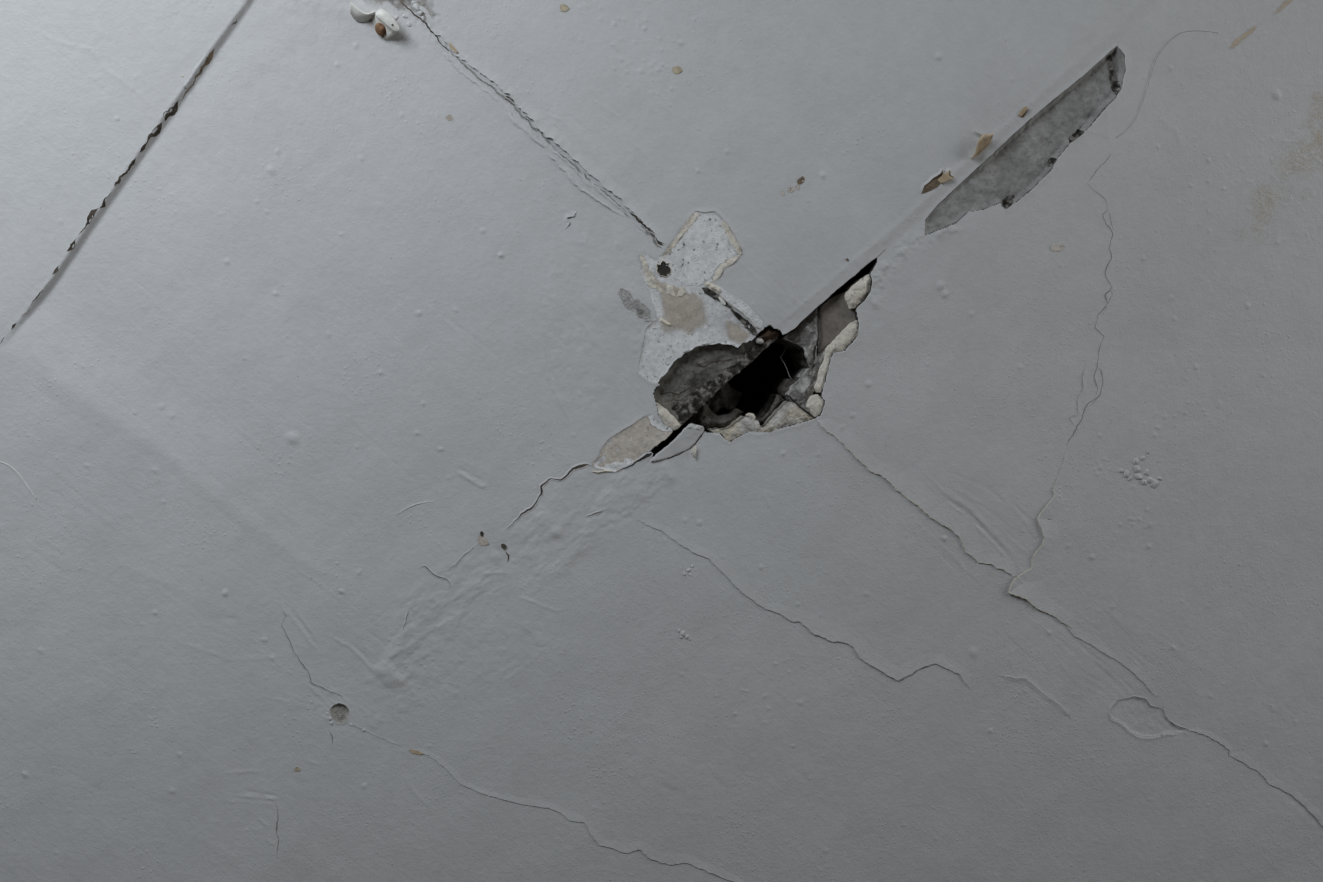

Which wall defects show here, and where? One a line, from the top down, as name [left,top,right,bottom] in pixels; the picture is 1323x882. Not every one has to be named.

crack [0,0,249,344]
crack [394,0,666,249]
spalling [920,44,1133,235]
spalling [592,207,886,473]
crack [1067,150,1114,447]
crack [419,452,653,589]
crack [280,606,403,747]
peeling [1107,695,1191,742]